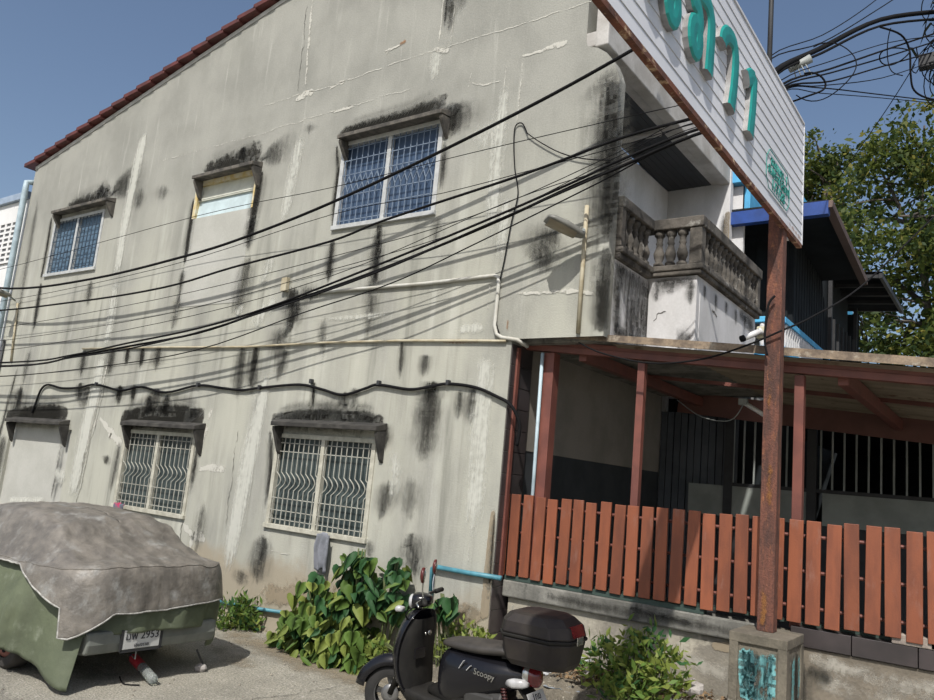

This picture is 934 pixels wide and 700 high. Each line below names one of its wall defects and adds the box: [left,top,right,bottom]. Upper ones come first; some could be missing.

damp [69,135,146,270]
damp [204,141,277,172]
damp [246,172,263,248]
crack [163,0,591,161]
damp [340,94,463,134]
damp [478,94,510,253]
damp [593,76,692,346]
damp [69,285,117,493]
damp [226,347,388,564]
damp [458,361,493,530]
peeling [685,655,725,679]
peeling [712,642,776,700]